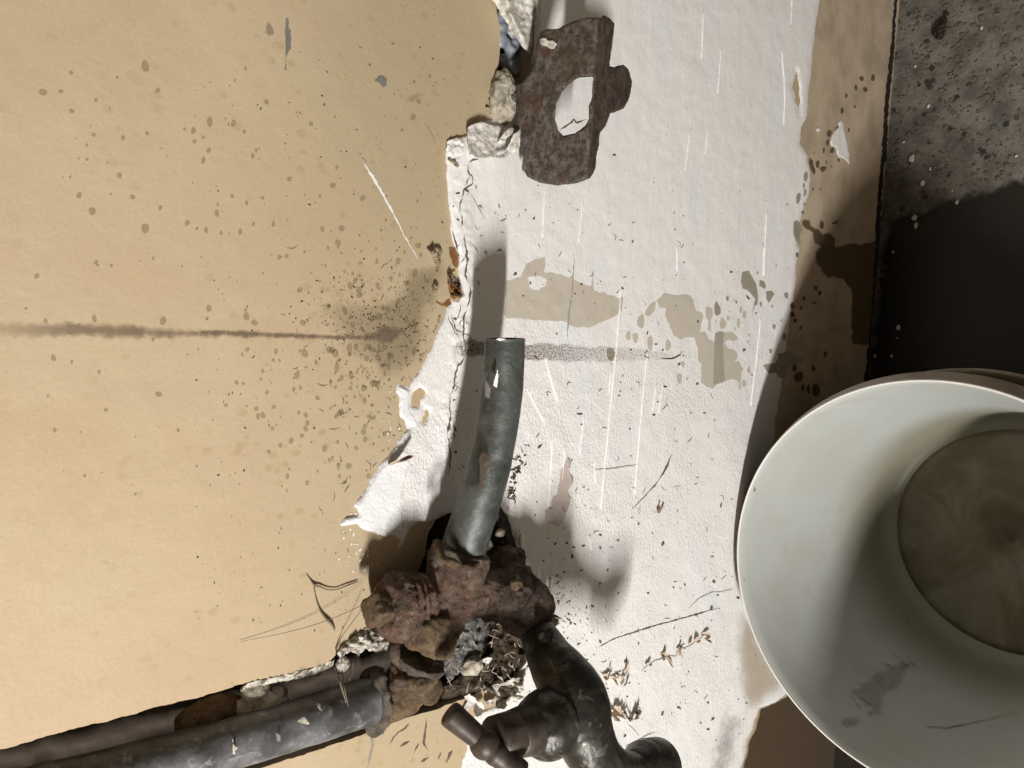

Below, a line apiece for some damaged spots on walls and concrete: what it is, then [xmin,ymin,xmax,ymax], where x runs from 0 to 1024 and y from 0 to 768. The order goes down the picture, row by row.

peeling [492,0,541,70]
peeling [446,121,520,162]
leakage [67,326,355,339]
corrosion [449,248,459,272]
crack [447,159,479,474]
leakage [505,258,623,327]
leakage [626,271,821,396]
flaking render [381,387,429,441]
flaking render [338,451,413,573]
corrosion [510,580,523,591]
spalling [0,627,391,768]
spalling [464,642,528,718]